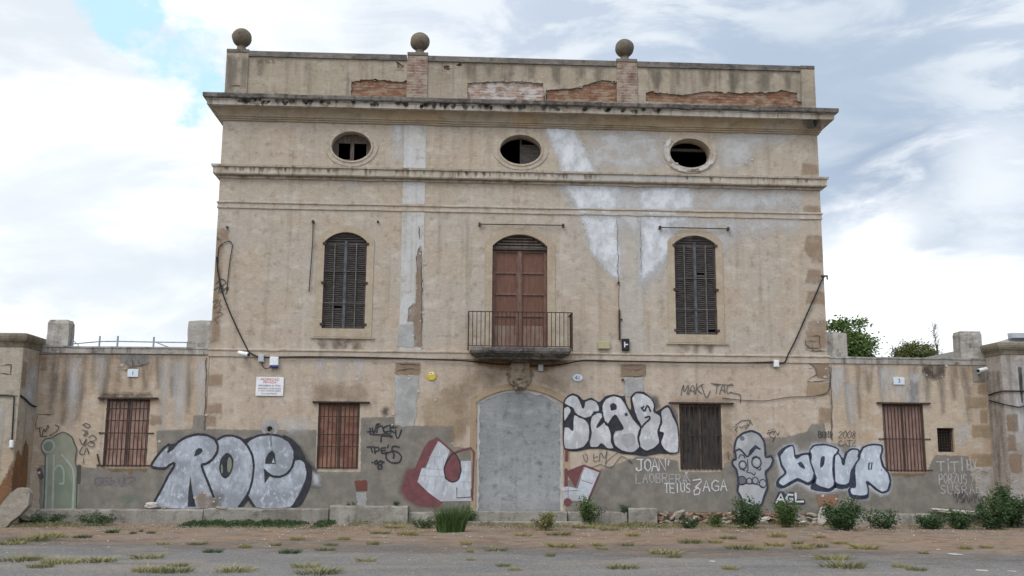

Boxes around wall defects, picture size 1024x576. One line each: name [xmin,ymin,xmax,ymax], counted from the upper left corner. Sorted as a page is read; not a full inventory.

flaking render [351,63,407,97]
flaking render [467,80,617,102]
flaking render [646,90,801,107]
flaking render [408,248,426,348]